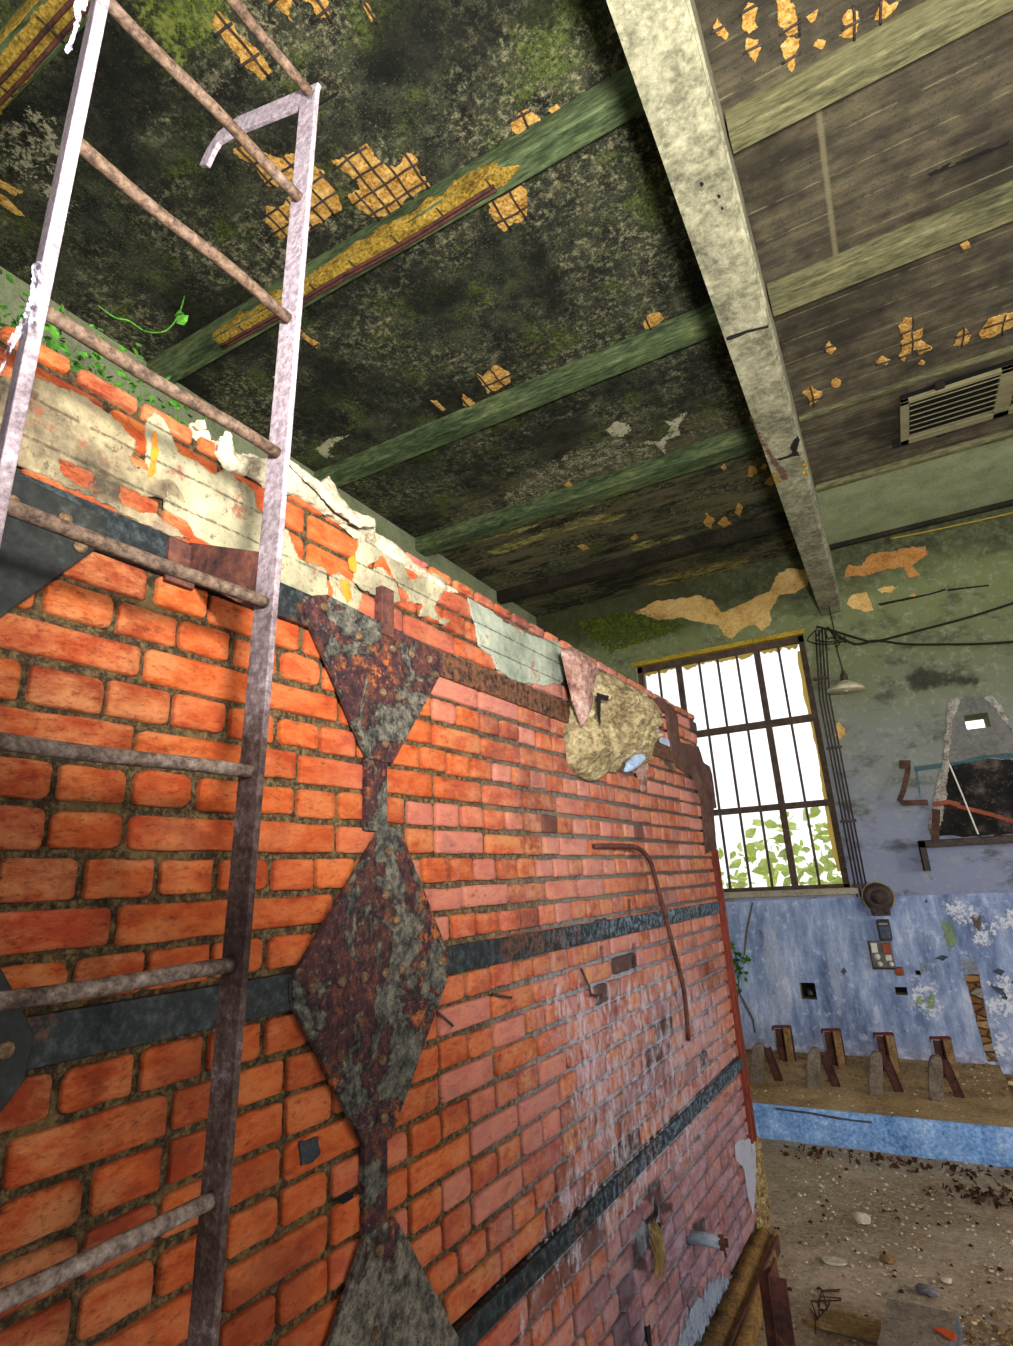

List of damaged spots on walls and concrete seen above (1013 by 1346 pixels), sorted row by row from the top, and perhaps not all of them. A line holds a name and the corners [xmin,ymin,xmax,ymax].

spalling [0,0,91,115]
leakage [133,0,229,79]
leakage [0,106,60,206]
spalling [302,144,531,305]
peeling [17,377,262,552]
leakage [316,435,348,458]
leakage [501,412,687,507]
peeling [280,529,450,626]
peeling [467,597,566,686]
leakage [466,498,625,554]
leakage [630,535,686,551]
flaking render [635,568,809,639]